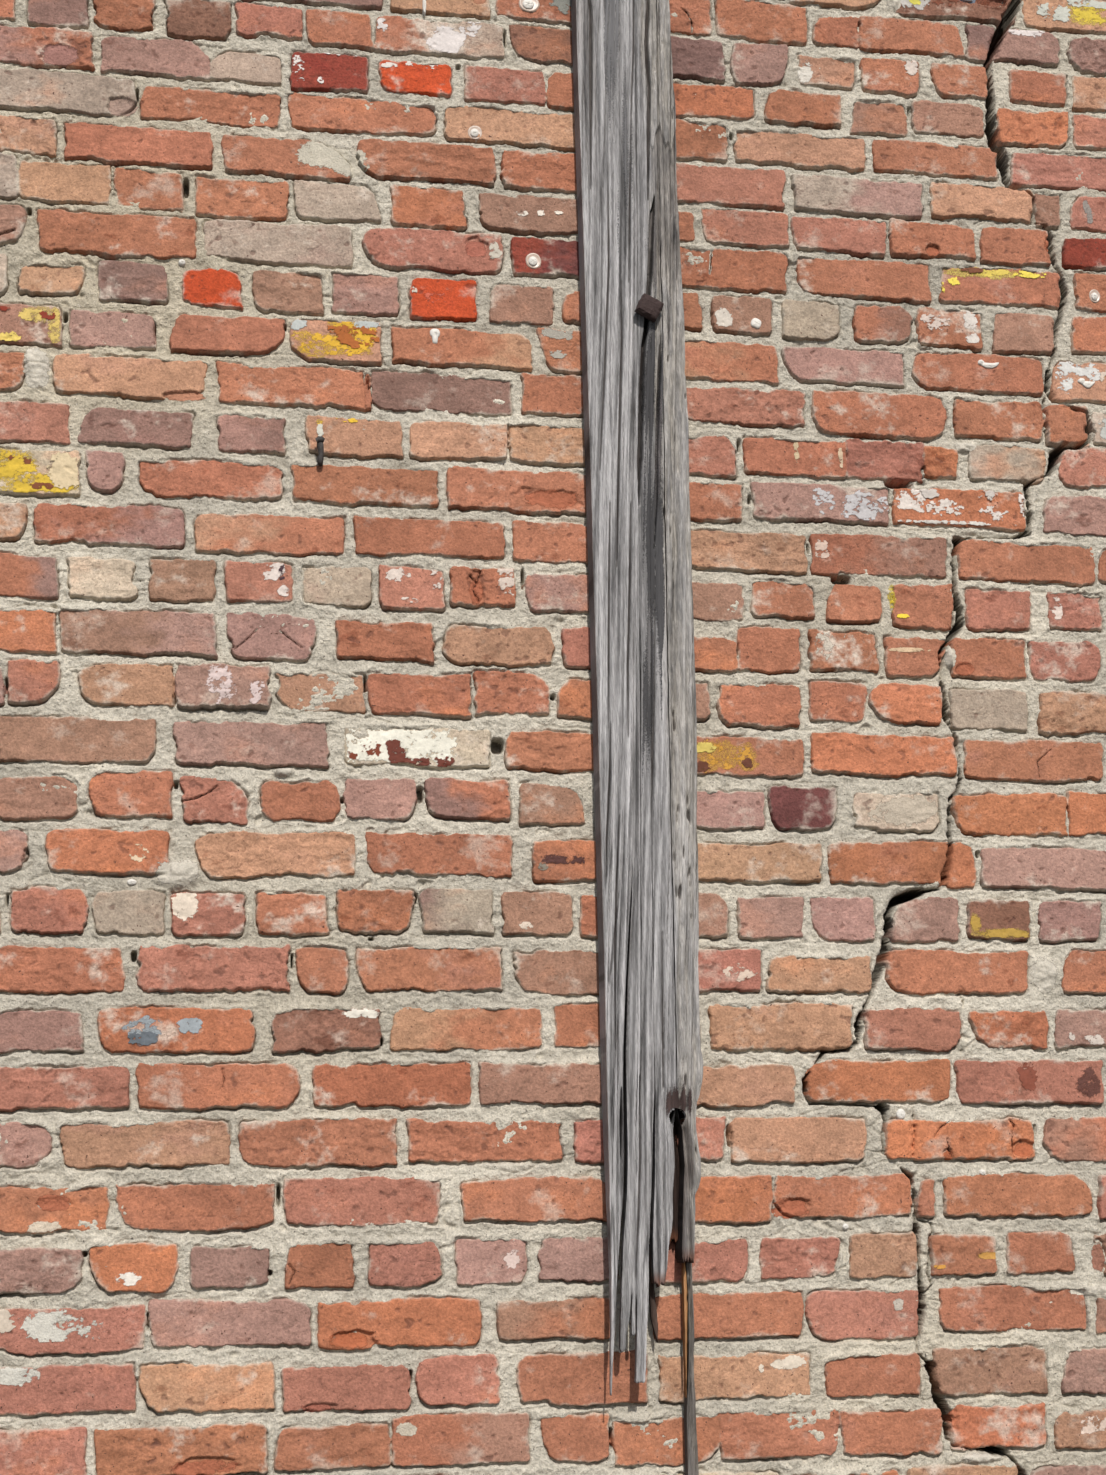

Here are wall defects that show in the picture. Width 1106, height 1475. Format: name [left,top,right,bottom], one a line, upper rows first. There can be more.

crack [983,0,1090,539]
crack [802,539,963,1098]
crack [872,1103,1026,1475]